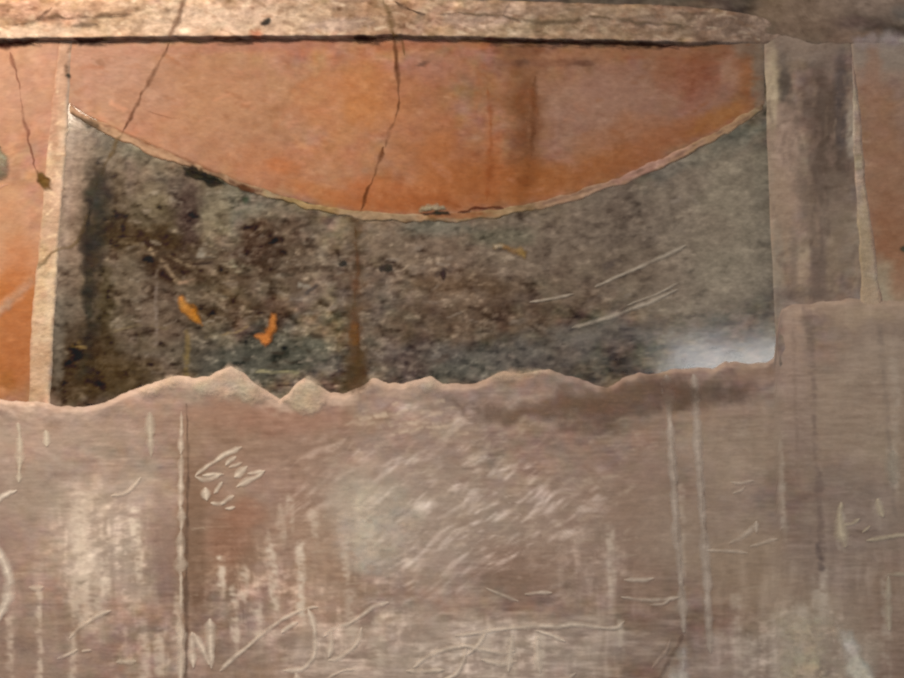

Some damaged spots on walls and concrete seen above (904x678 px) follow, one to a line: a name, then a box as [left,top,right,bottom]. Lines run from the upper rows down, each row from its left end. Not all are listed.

crack [166,1,184,50]
crack [391,26,404,108]
crack [110,72,154,156]
crack [23,121,50,189]
crack [360,147,383,211]